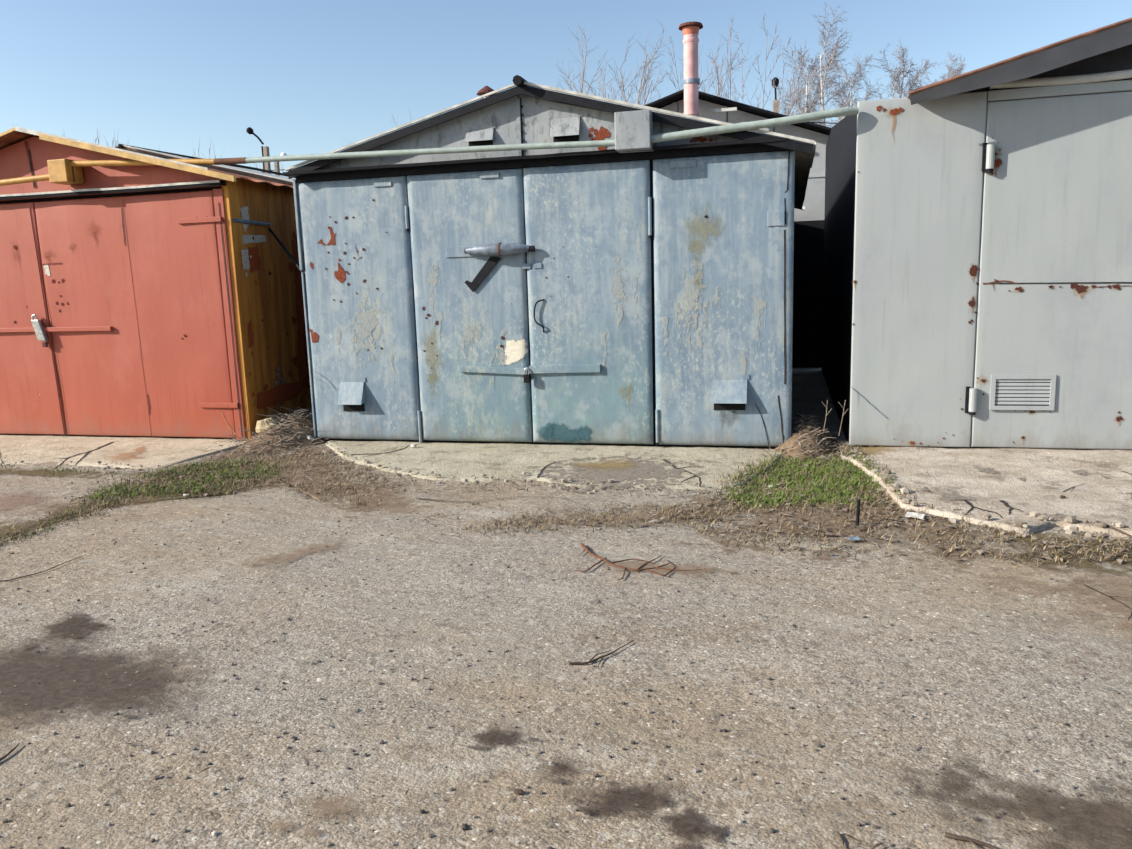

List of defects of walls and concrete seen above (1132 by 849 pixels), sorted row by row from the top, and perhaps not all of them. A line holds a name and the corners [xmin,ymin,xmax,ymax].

rust [876,106,903,132]
rust [588,126,610,150]
rust [318,227,336,246]
rust [334,259,349,283]
rust [968,265,979,324]
rust [1049,284,1129,298]
peeling [492,327,528,366]